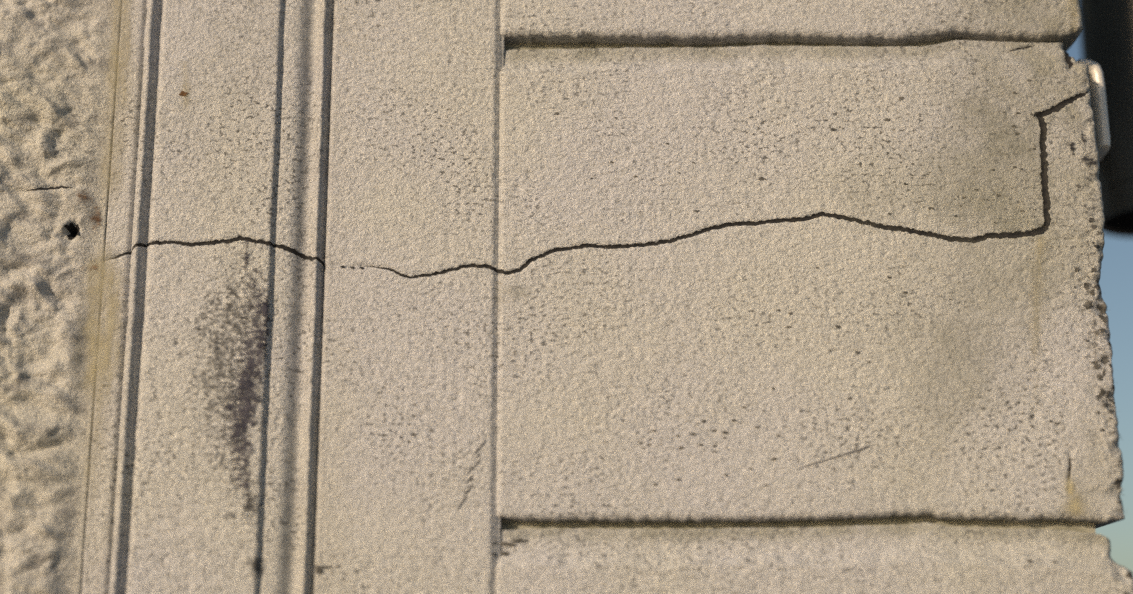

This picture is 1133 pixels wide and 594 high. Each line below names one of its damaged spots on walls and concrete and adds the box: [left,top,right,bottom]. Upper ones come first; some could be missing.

crack [106,51,1088,278]
water stain [194,240,270,518]